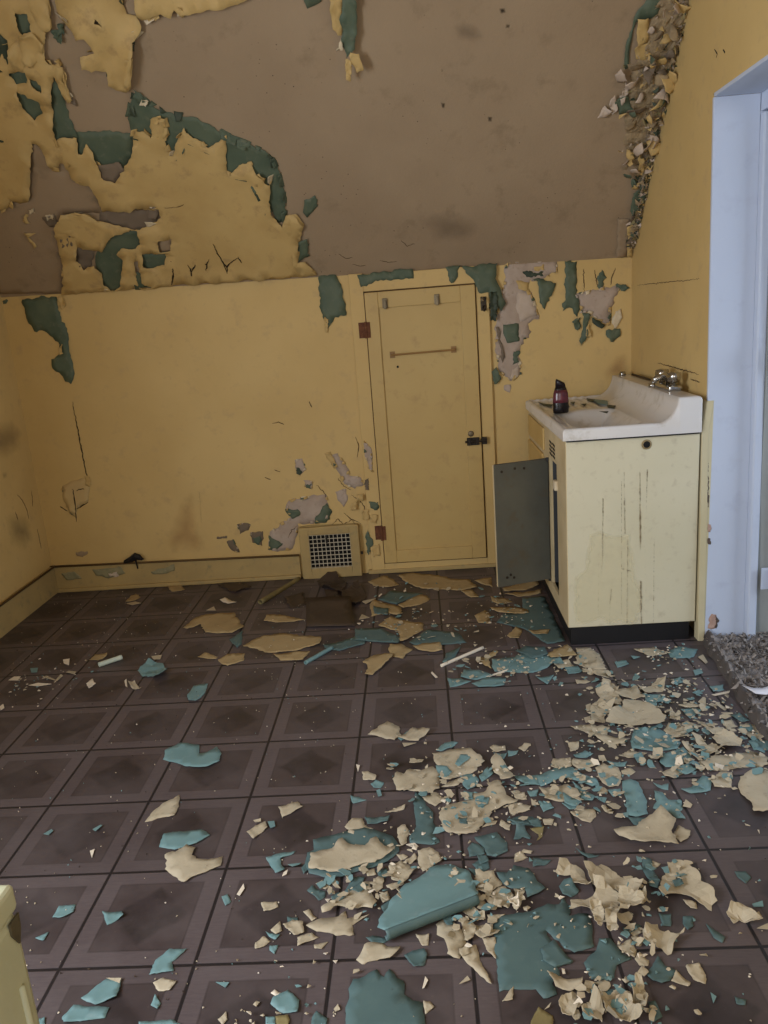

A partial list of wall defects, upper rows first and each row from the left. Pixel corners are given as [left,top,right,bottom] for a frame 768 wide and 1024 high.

peeling [304,0,364,81]
peeling [0,0,347,384]
peeling [598,0,691,258]
flaking render [446,260,629,393]
crack [60,407,88,522]
flaking render [217,441,380,557]